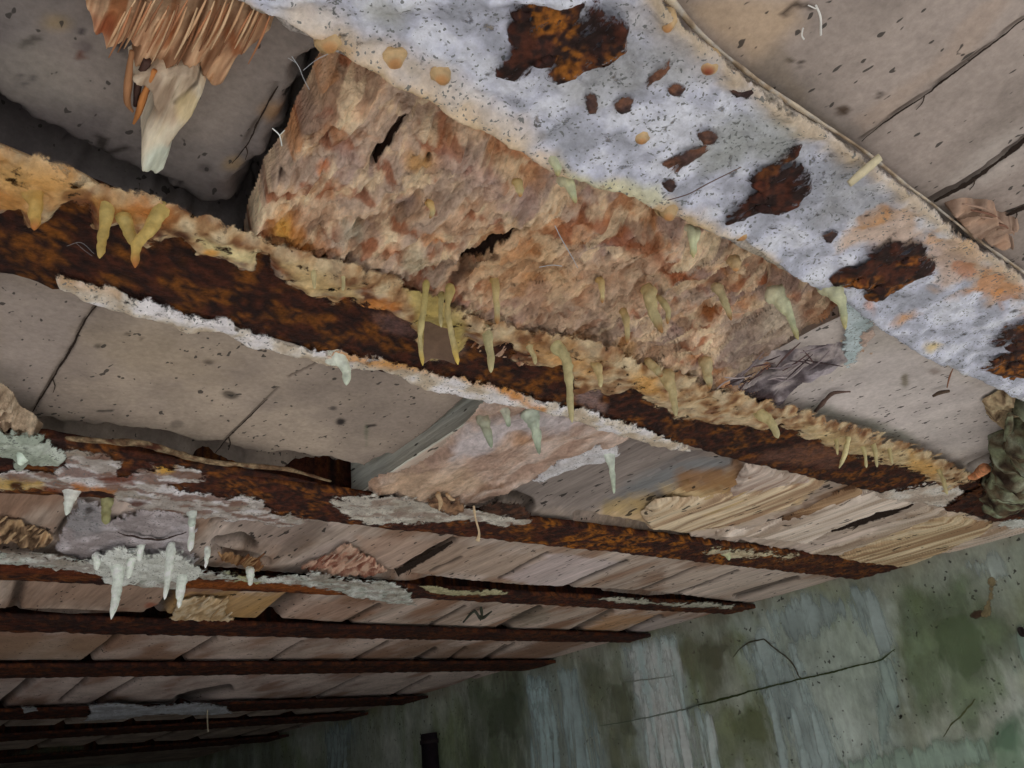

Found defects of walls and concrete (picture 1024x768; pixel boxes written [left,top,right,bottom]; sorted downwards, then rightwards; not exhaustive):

spalling [86,0,274,173]
rust [495,0,629,85]
crack [862,19,1024,141]
water stain [0,143,975,507]
spalling [244,52,848,407]
water stain [238,0,1024,401]
rust [725,144,812,225]
rust [829,238,936,302]
crack [934,137,1024,202]
water stain [0,429,532,619]
spalling [641,463,1024,567]
crack [599,638,895,726]